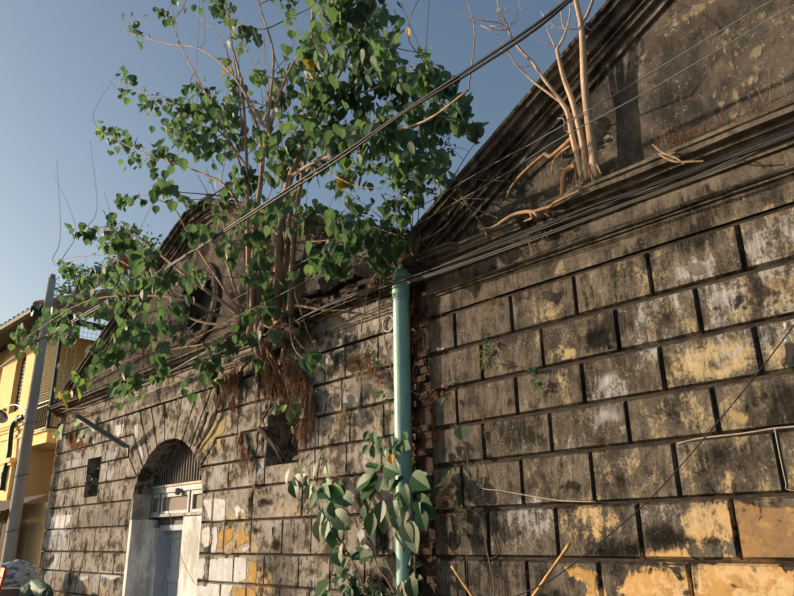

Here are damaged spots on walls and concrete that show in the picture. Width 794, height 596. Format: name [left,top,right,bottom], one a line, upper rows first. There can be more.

flaking render [667,0,718,27]
damp [554,258,566,276]
damp [585,329,612,352]
damp [784,343,794,366]
damp [599,374,616,391]
damp [598,408,619,423]
damp [560,476,581,493]
peeling [202,527,219,558]